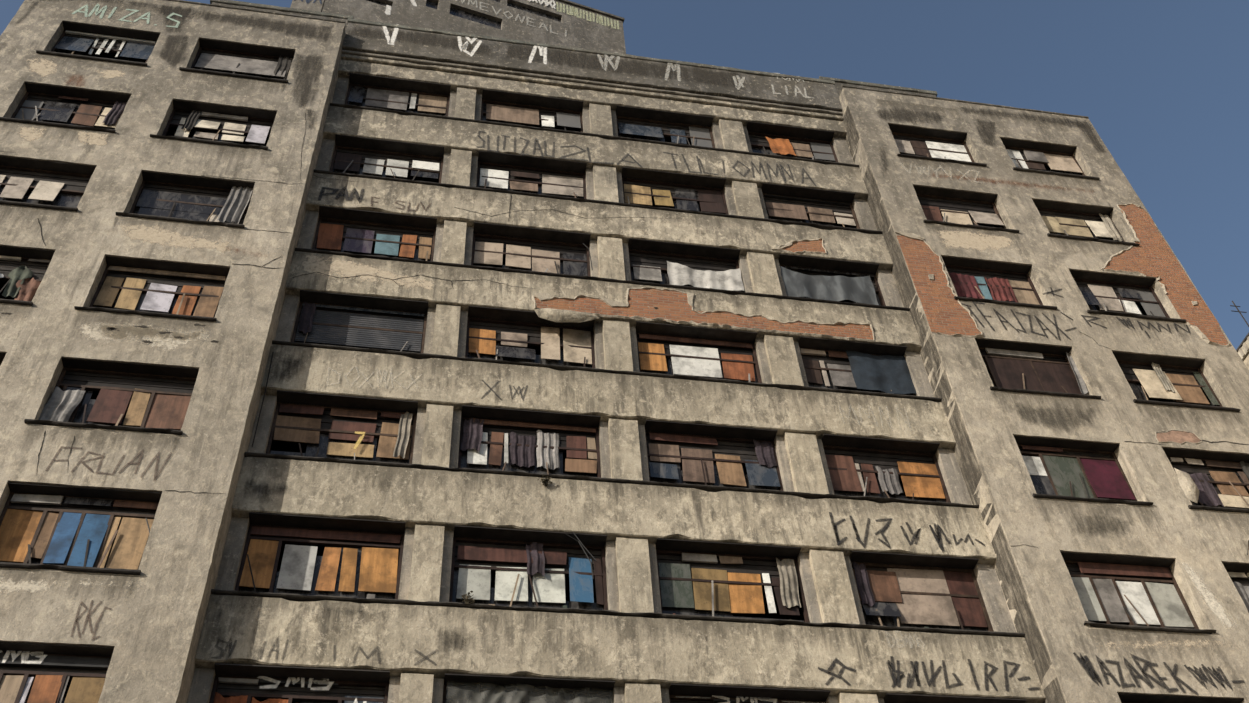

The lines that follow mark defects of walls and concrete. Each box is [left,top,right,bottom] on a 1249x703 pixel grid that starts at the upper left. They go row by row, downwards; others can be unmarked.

spalling [532,287,876,342]
spalling [771,238,827,255]
spalling [895,231,1012,338]
spalling [1100,203,1231,347]